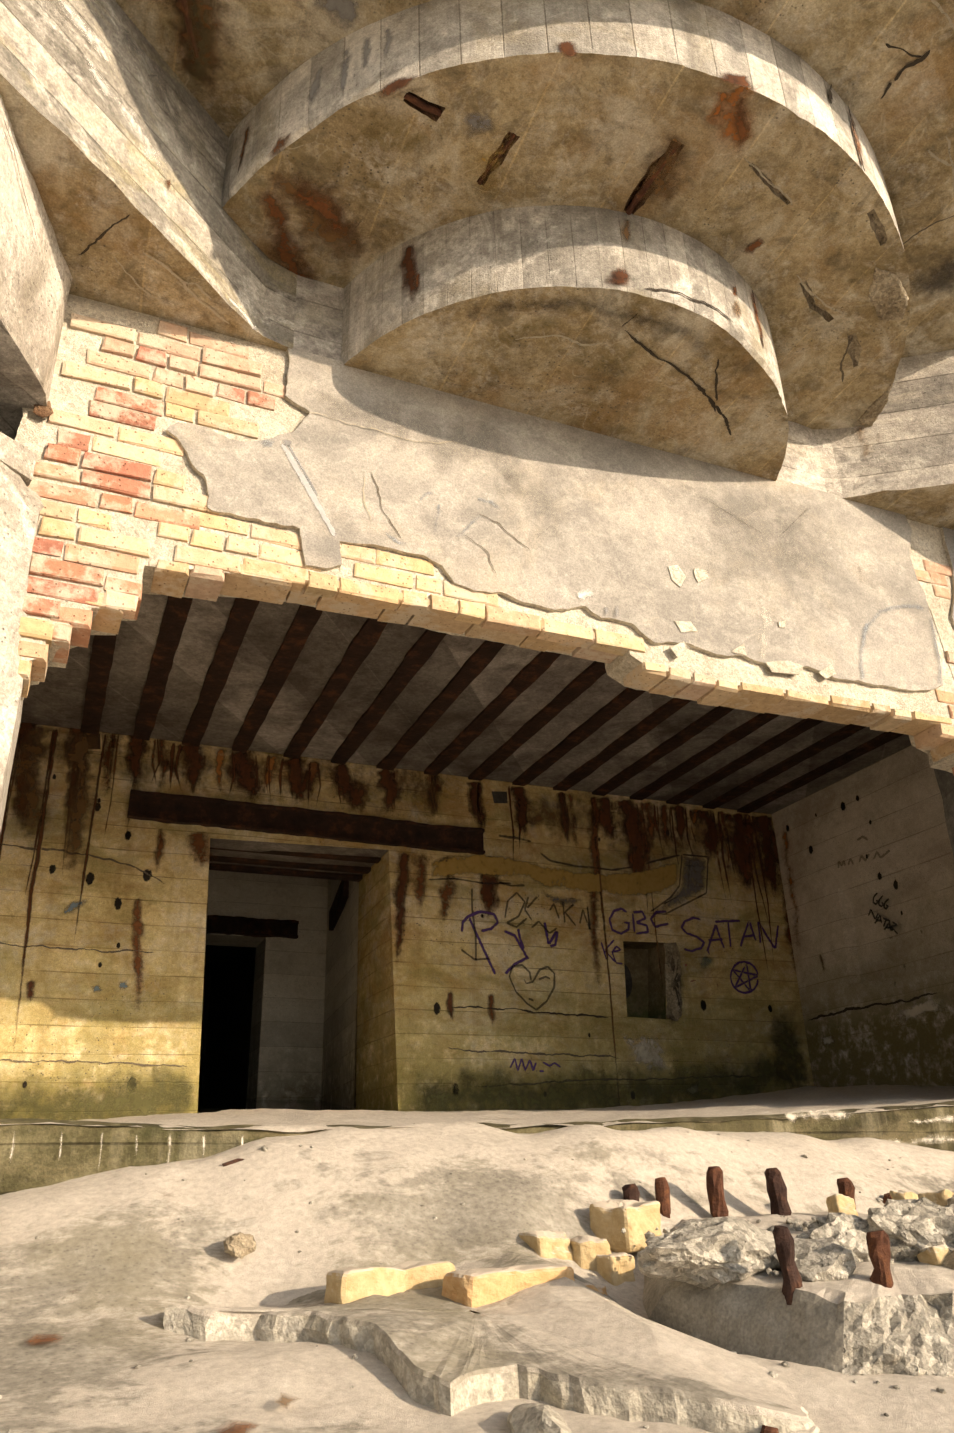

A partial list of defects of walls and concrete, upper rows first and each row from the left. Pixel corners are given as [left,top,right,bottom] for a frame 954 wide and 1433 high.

rust [164,0,222,85]
rust [622,137,683,241]
crack [745,159,792,205]
crack [515,288,764,435]
crack [797,275,853,382]
flaking render [18,311,645,661]
flaking render [909,532,954,727]